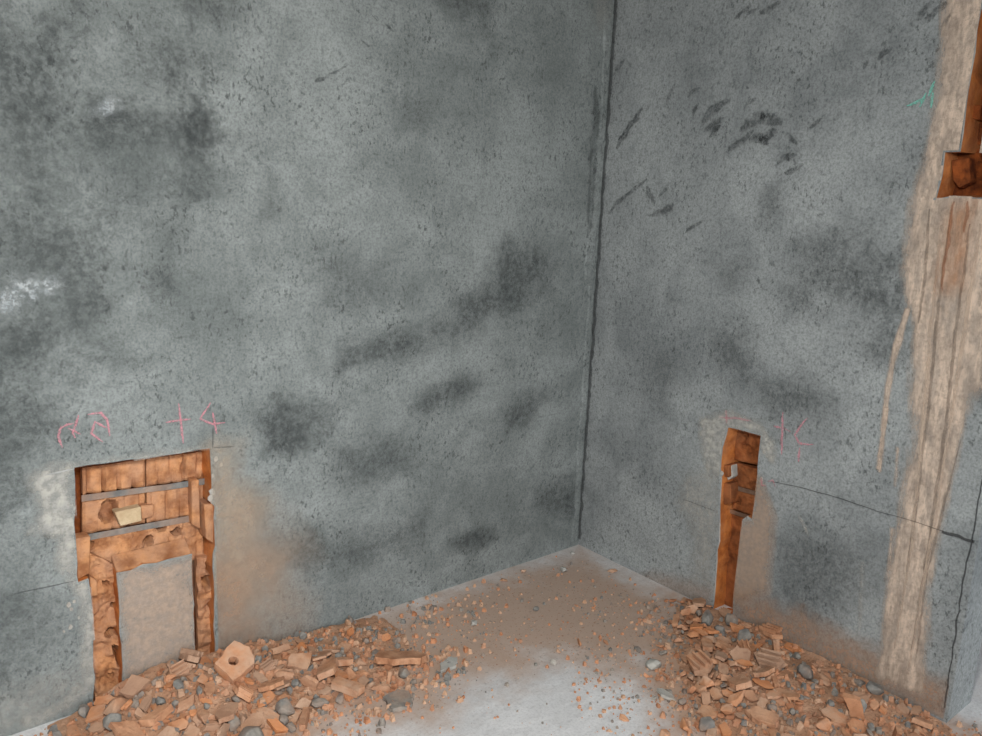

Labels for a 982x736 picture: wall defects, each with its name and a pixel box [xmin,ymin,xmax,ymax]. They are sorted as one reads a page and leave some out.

leakage [1,281,52,309]
flaking render [208,456,223,502]